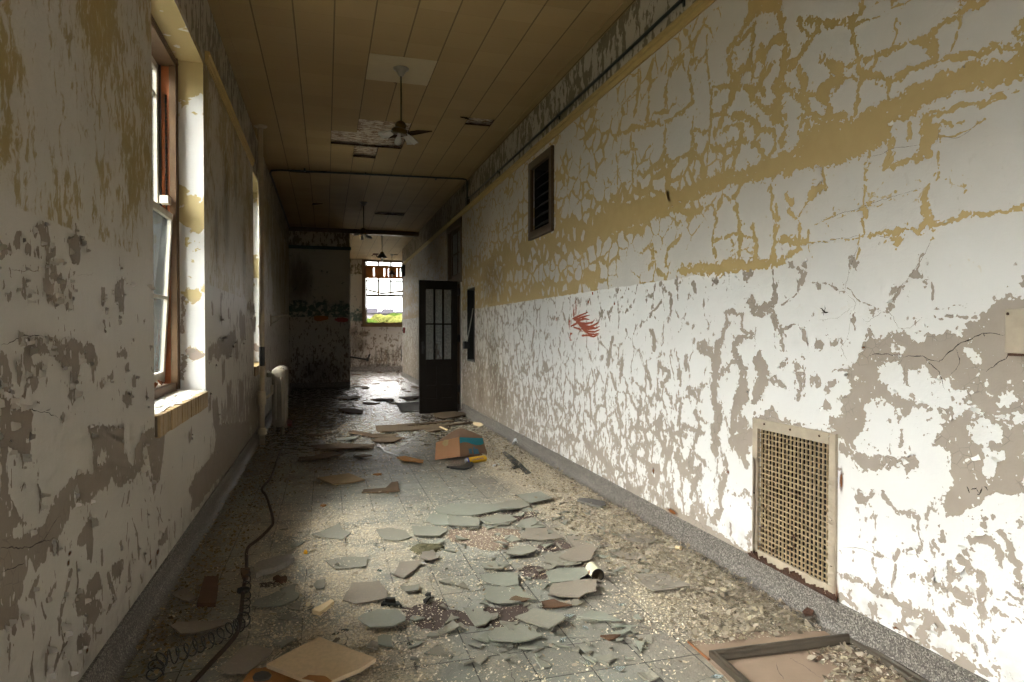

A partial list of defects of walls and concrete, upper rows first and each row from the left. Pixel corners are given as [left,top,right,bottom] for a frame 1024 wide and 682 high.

peeling [0,221,283,682]
peeling [400,0,1024,682]
crack [812,188,1008,387]